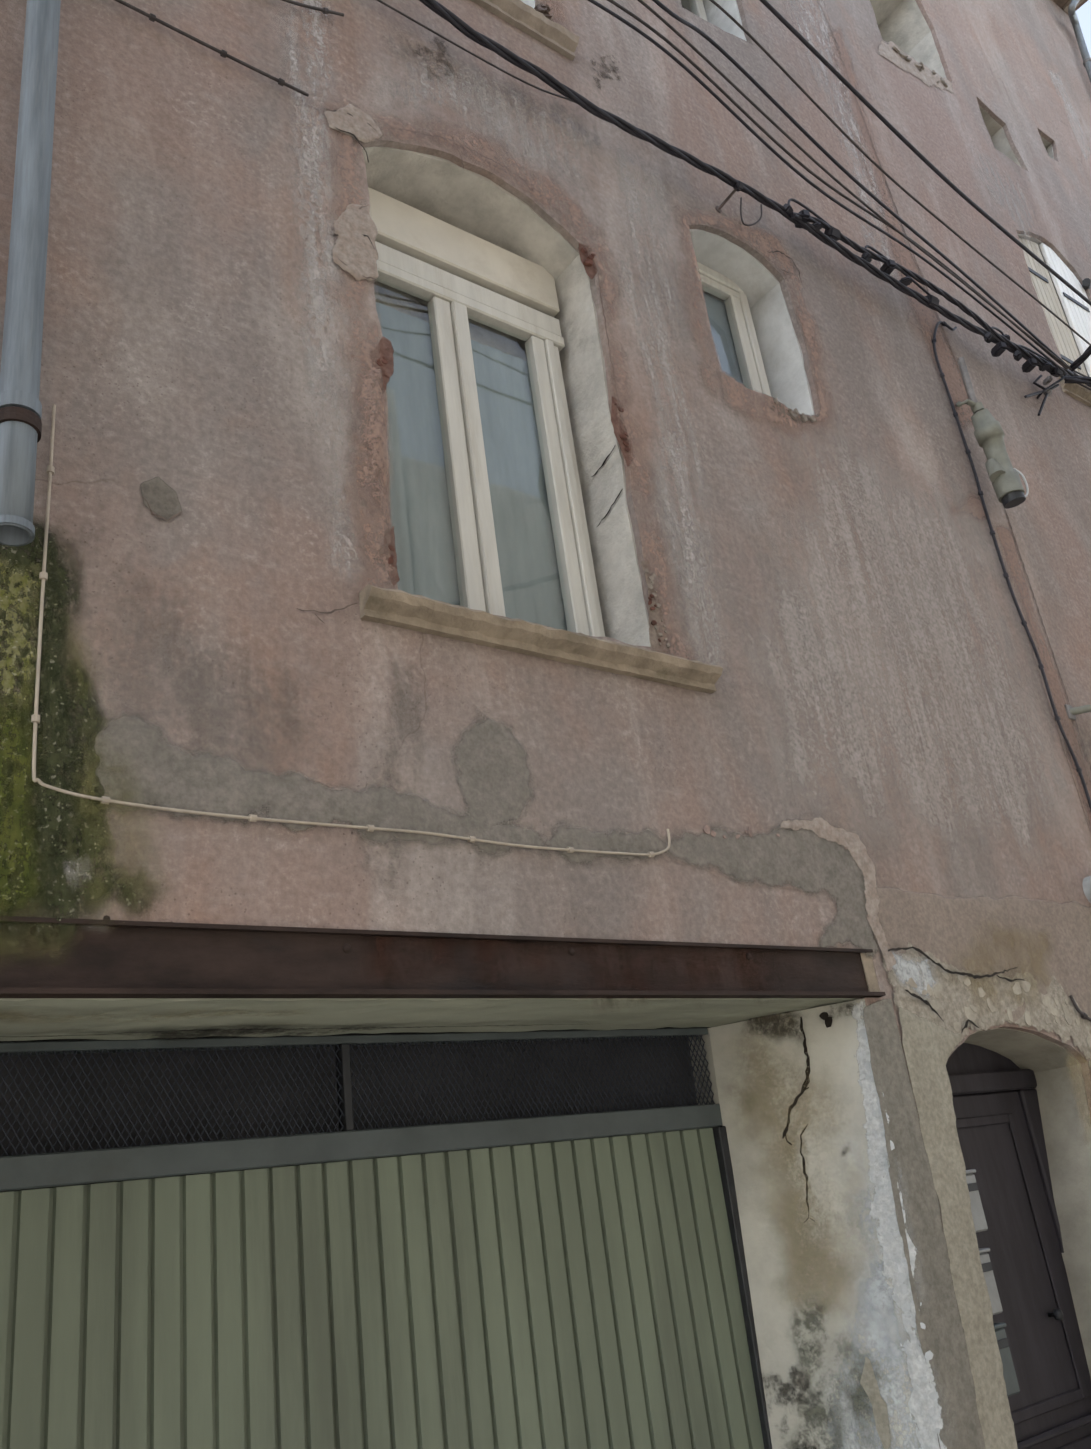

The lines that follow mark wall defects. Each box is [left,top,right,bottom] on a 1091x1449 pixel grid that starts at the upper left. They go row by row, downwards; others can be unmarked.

water stain [0,559,125,910]
crack [782,1017,814,1223]
peeling [819,1012,832,1028]
peeling [882,943,1091,1060]
peeling [851,1000,947,1449]
water stain [762,1266,917,1449]